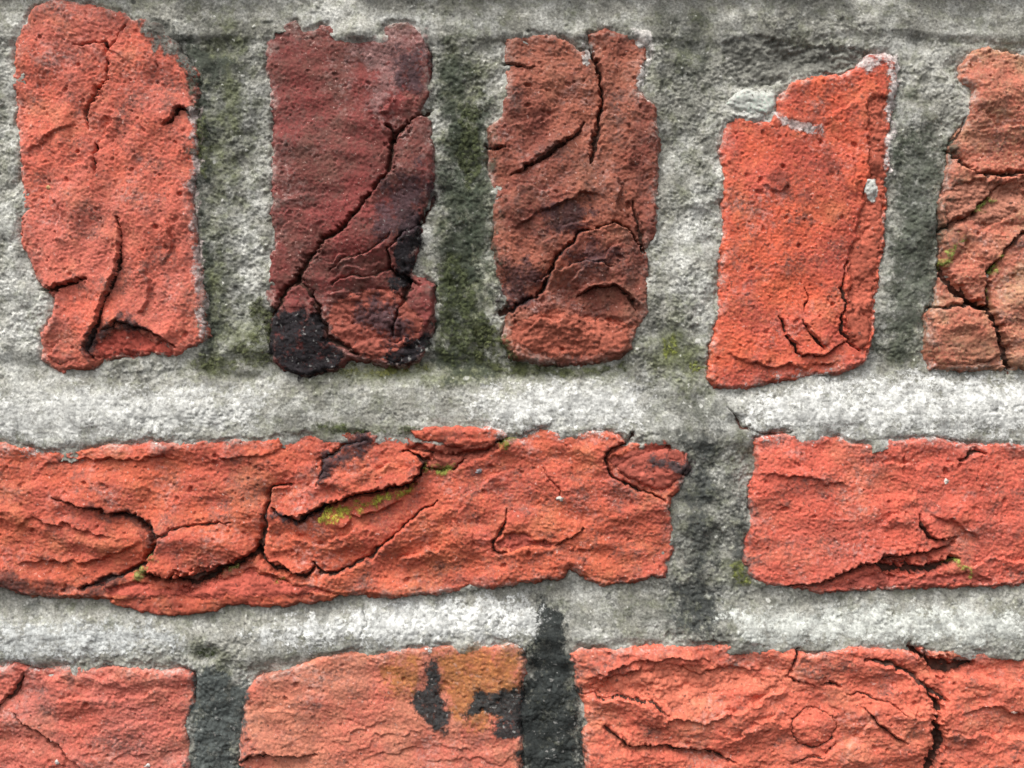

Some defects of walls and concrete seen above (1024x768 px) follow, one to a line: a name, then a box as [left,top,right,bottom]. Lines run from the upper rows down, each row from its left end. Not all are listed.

crack [523,55,604,171]
crack [41,234,164,358]
crack [272,112,436,354]
damp [430,28,657,441]
crack [498,203,645,317]
crack [780,266,859,357]
crack [924,233,1022,374]
crack [82,440,502,590]
crack [787,518,953,587]
damp [236,587,586,768]
crack [605,726,729,759]
crack [864,645,970,768]